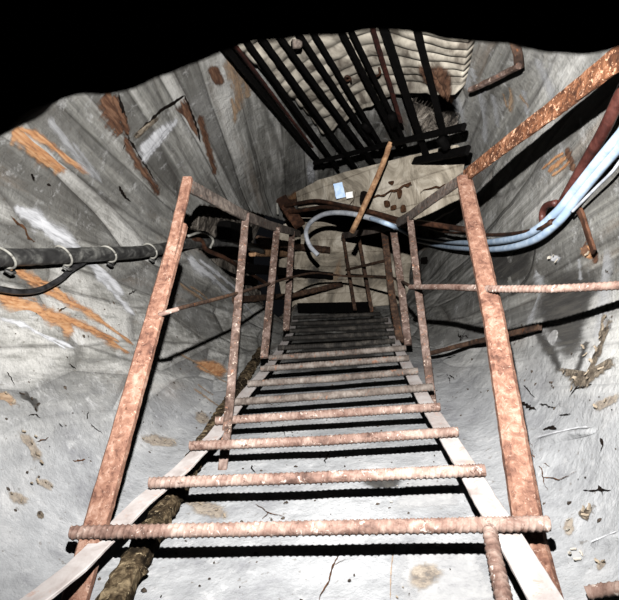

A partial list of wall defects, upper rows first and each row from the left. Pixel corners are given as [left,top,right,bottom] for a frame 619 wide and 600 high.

corrosion [208,59,251,122]
corrosion [11,127,89,174]
crack [118,95,155,180]
corrosion [197,115,217,175]
corrosion [542,147,576,176]
corrosion [581,242,598,263]
corrosion [0,266,132,353]
spalling [559,311,613,391]
peeling [593,395,617,410]
peeling [21,430,44,464]
spalling [578,503,592,520]
damp [411,565,441,587]